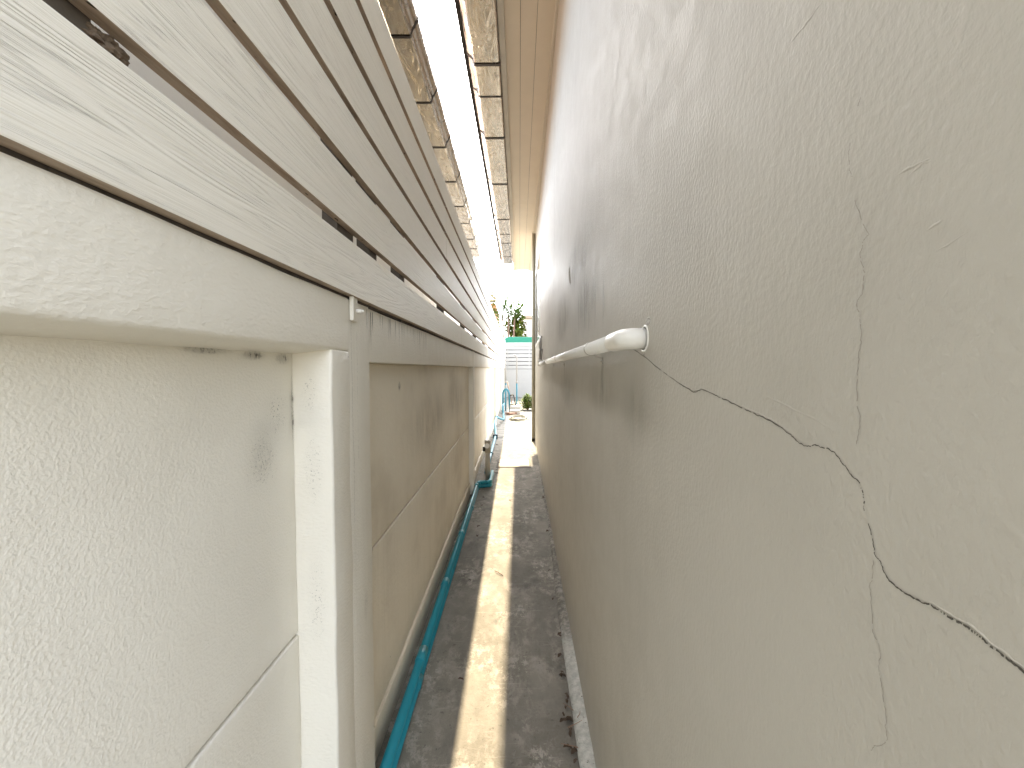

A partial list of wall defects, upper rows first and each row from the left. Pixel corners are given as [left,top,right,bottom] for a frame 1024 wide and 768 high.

crack [635,200,1024,751]